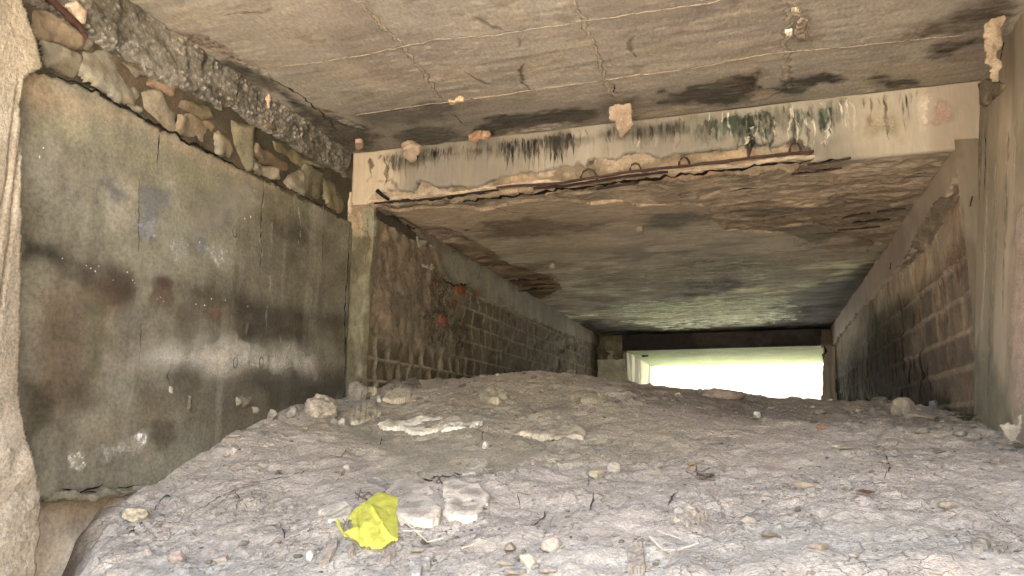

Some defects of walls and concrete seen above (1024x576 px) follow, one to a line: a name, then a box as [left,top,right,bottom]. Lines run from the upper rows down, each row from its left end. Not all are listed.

peeling [978,15,1006,107]
leakage [224,61,595,181]
peeling [401,140,422,163]
corrosion [374,142,851,204]
leakage [607,117,681,141]
peeling [609,103,706,138]
leakage [657,73,847,151]
spalling [369,144,960,299]
leakage [154,342,336,402]